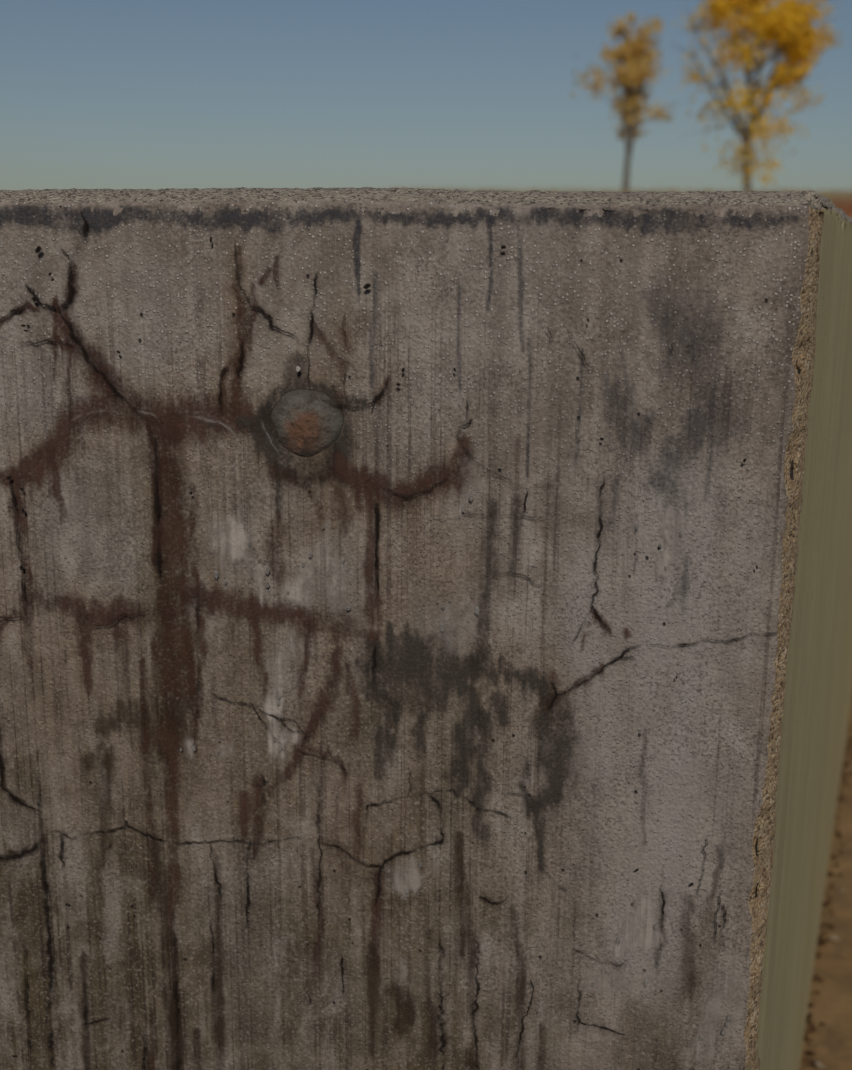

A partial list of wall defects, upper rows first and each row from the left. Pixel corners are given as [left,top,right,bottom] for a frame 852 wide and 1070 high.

crack [0,213,126,400]
damp [0,264,366,564]
crack [218,340,244,404]
damp [178,208,361,295]
crack [234,244,318,380]
damp [377,207,514,266]
damp [531,207,705,233]
damp [320,425,470,646]
crack [374,480,444,589]
crack [574,480,608,639]
damp [183,584,350,778]
crack [549,633,776,708]